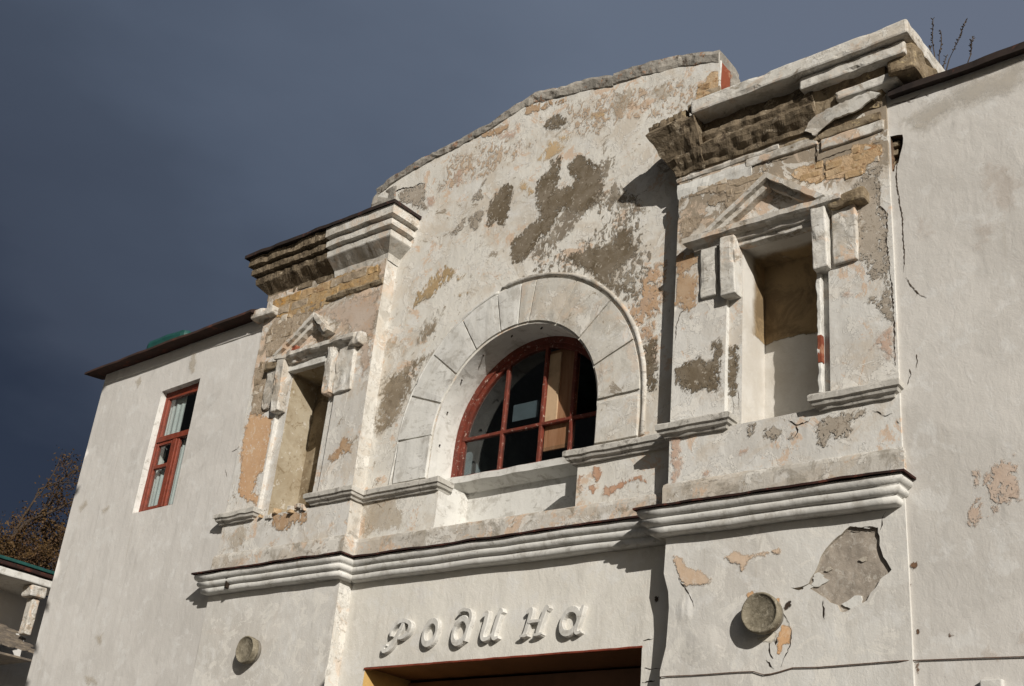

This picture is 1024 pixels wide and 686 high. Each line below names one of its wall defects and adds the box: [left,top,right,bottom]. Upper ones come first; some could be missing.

spalling [398,71,721,264]
spalling [409,265,465,312]
spalling [567,167,767,391]
spalling [791,135,903,356]
crack [879,161,925,383]
flaking render [238,264,381,531]
spalling [746,423,798,442]
spalling [815,408,866,447]
peeling [967,454,1023,527]
peeling [673,555,712,587]
peeling [724,548,781,571]
spalling [777,526,891,612]